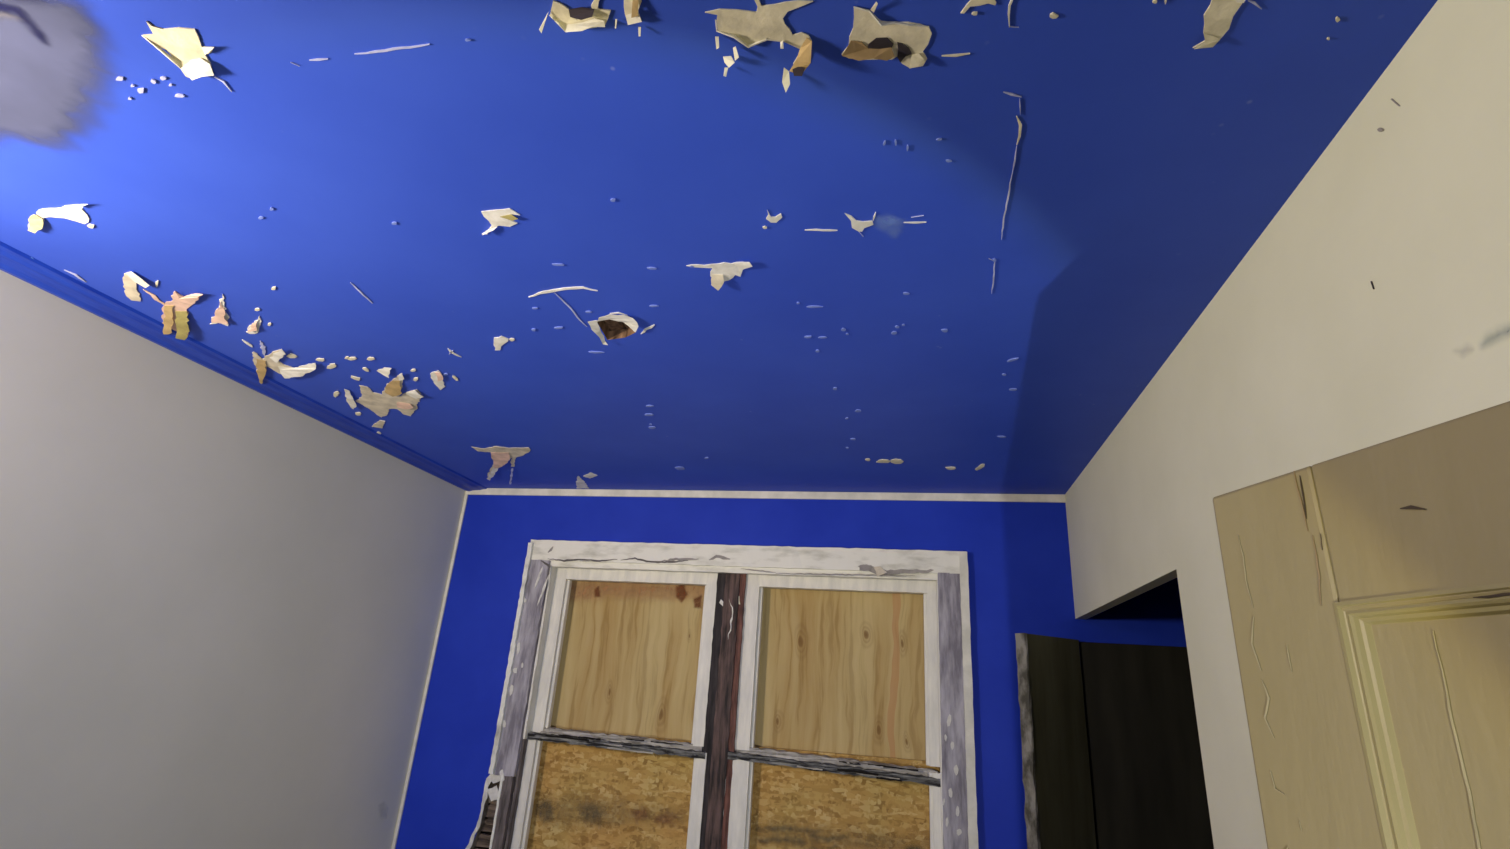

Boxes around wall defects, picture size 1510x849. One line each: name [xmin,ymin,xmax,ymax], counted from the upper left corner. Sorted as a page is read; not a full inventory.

damp [0,0,105,145]
peeling [116,21,232,100]
peeling [539,0,642,36]
peeling [705,0,813,92]
peeling [841,2,932,68]
peeling [1193,0,1262,49]
peeling [28,204,94,233]
peeling [481,208,520,235]
peeling [123,271,229,340]
peeling [686,262,753,290]
peeling [242,308,458,434]
crack [1433,631,1481,849]